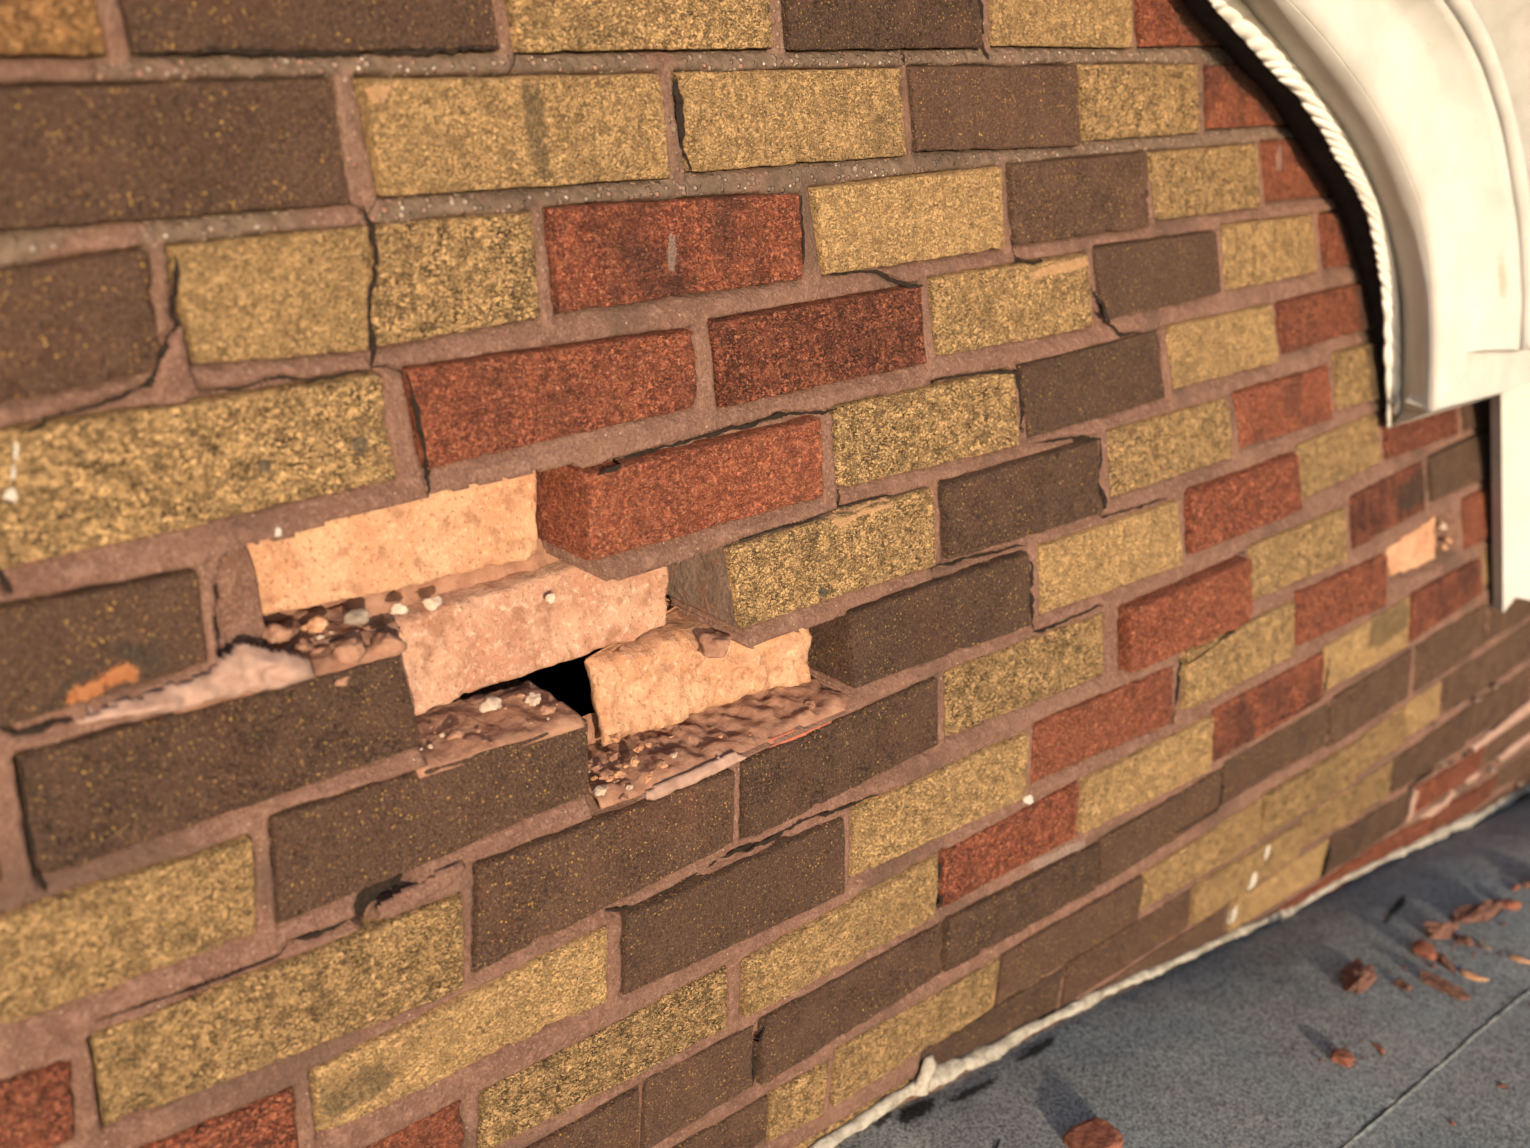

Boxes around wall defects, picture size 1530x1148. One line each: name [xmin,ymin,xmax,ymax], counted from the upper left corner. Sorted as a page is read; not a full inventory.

crack [26,253,180,432]
crack [203,196,431,495]
spalling [246,470,812,747]
crack [0,718,75,891]
spalling [642,751,746,800]
spalling [769,719,832,748]